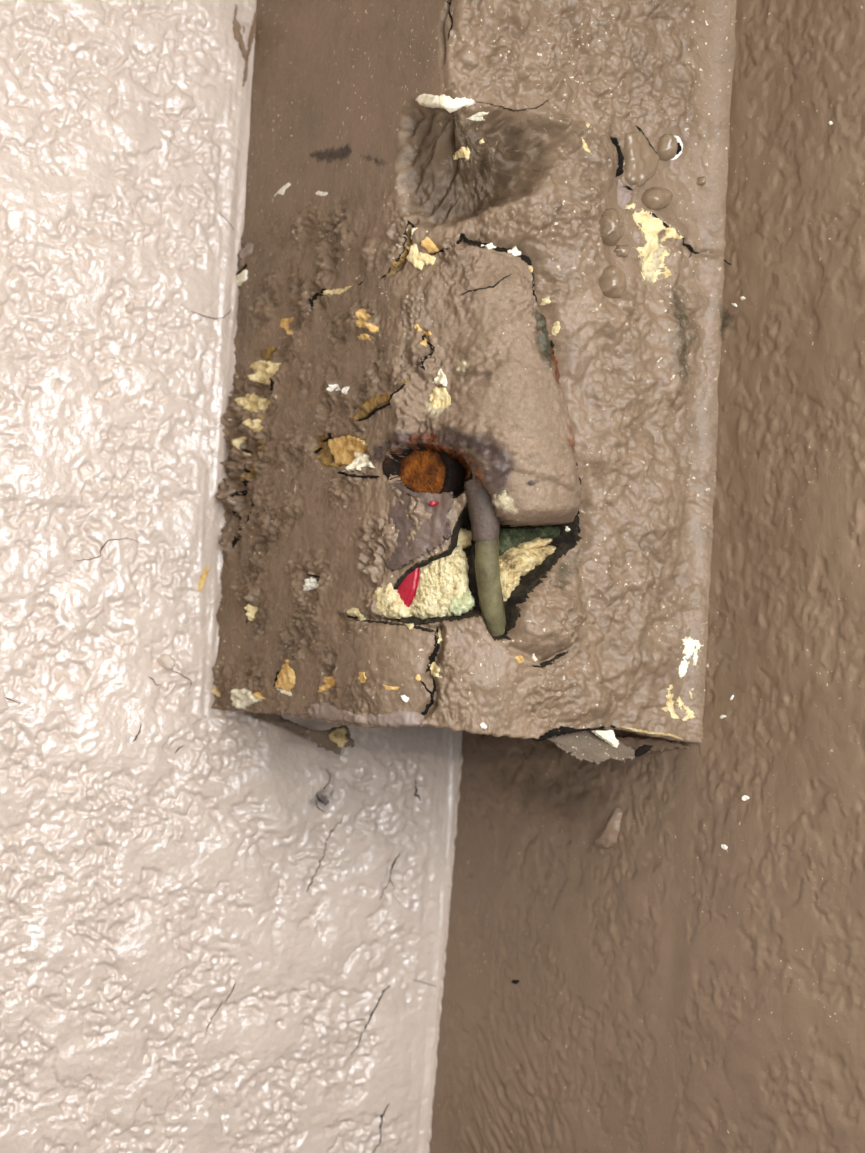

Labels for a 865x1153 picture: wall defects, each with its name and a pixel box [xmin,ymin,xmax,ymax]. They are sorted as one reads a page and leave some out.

crack [445,0,453,39]
flaking render [406,227,439,270]
crack [308,220,561,355]
flaking render [617,131,684,283]
crack [351,333,435,421]
flaking render [426,360,469,414]
rust [369,428,512,494]
flaking render [312,432,582,641]
crack [565,463,581,534]
crack [347,615,443,716]
flaking render [661,636,702,721]
peeling [547,726,690,765]